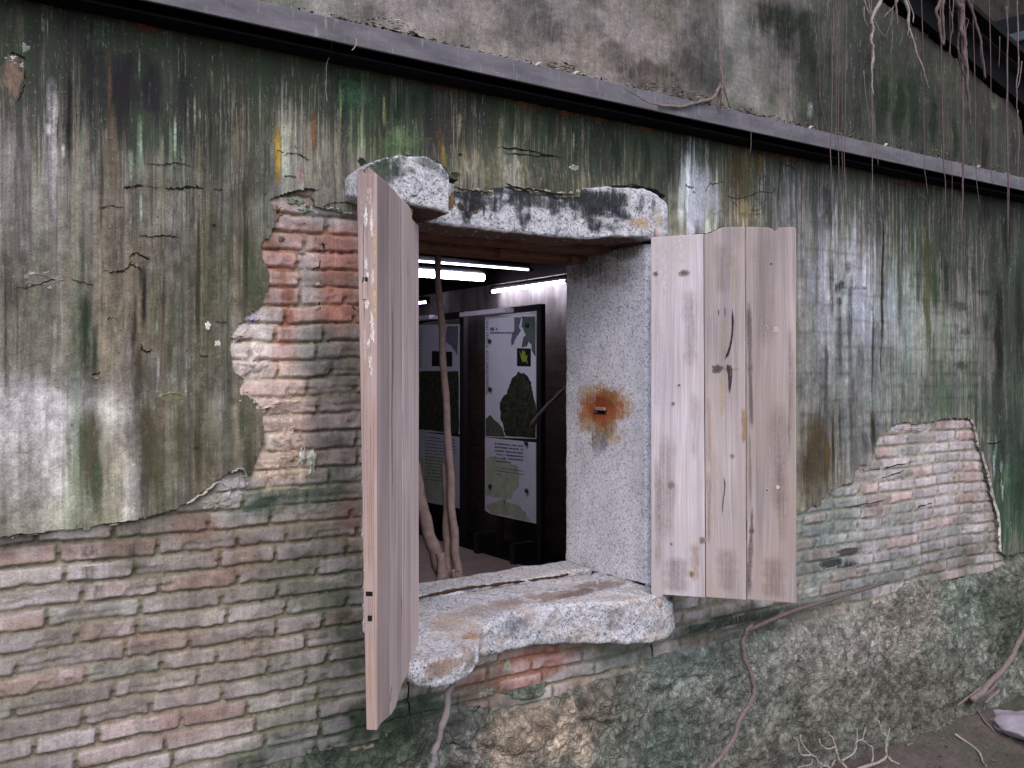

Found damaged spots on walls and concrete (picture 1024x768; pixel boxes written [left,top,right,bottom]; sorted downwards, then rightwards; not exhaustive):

flaking render [2,42,30,102]
water stain [47,82,83,212]
crack [501,146,558,157]
crack [100,162,223,209]
water stain [452,187,653,232]
crack [17,235,179,289]
water stain [825,225,909,401]
water stain [917,242,948,352]
rust [578,386,630,442]
water stain [80,415,102,504]
peeling [0,188,1004,768]
crack [419,571,645,599]